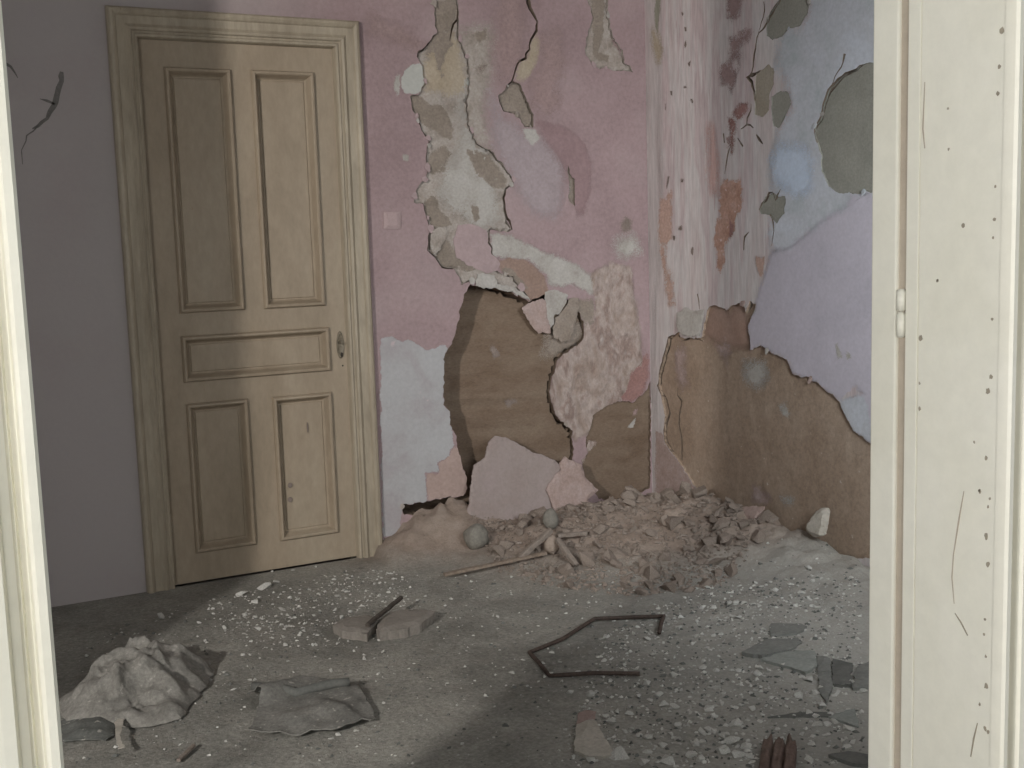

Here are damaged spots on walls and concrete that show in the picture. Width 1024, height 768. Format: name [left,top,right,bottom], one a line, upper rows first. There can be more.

spalling [394,0,874,559]